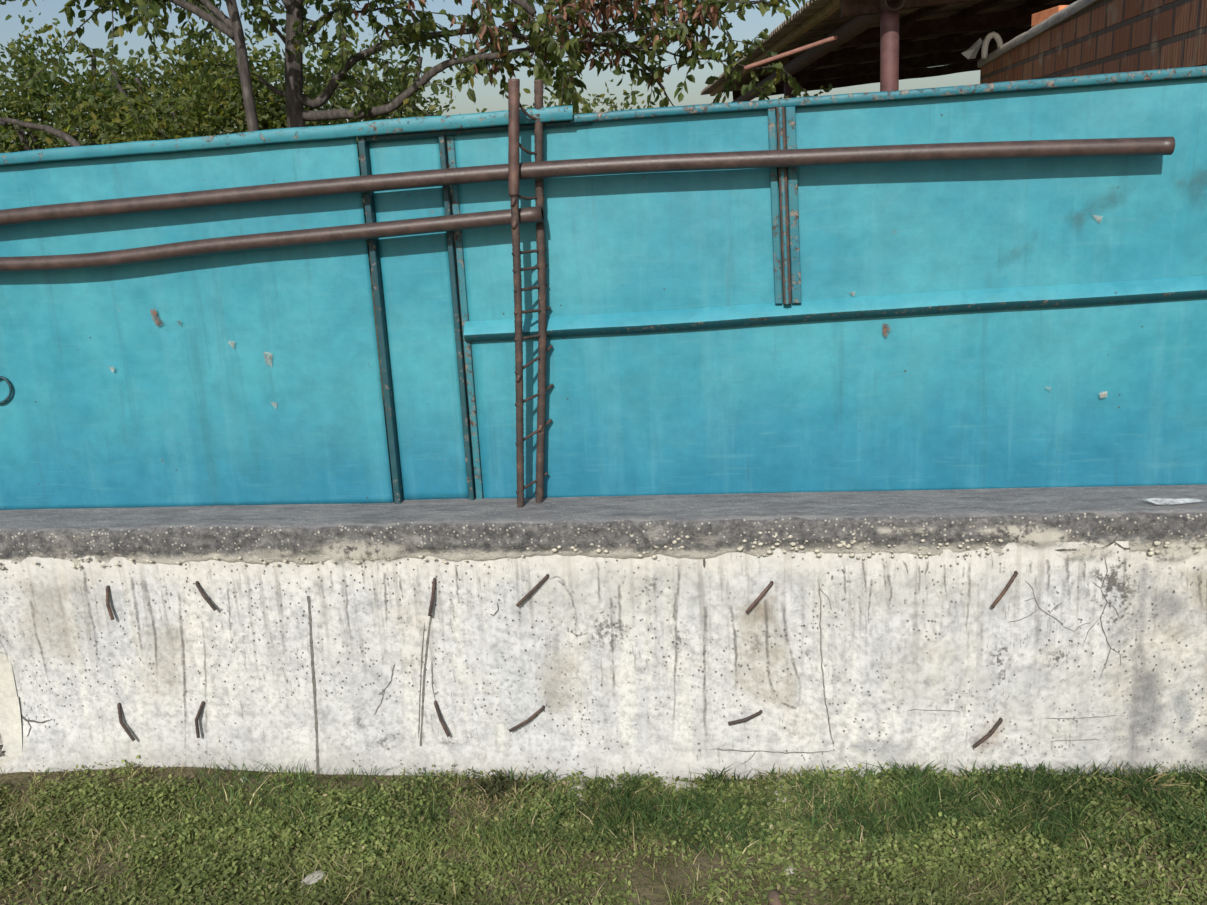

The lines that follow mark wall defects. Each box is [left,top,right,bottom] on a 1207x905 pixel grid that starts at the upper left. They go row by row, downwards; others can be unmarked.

crack [1007,537,1130,681]